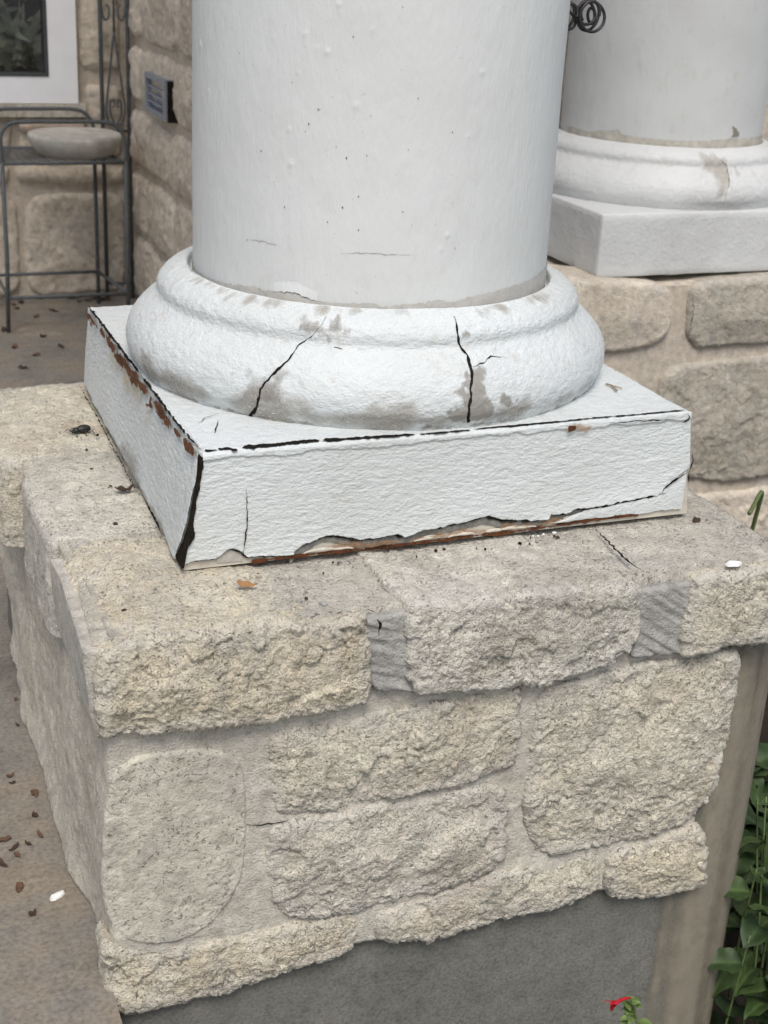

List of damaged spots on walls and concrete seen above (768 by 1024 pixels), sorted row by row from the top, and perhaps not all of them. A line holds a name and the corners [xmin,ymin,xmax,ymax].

corrosion [87,313,194,456]
crack [80,307,694,568]
flaking render [216,548,243,563]
corrosion [251,513,639,564]
flaking render [289,471,687,564]